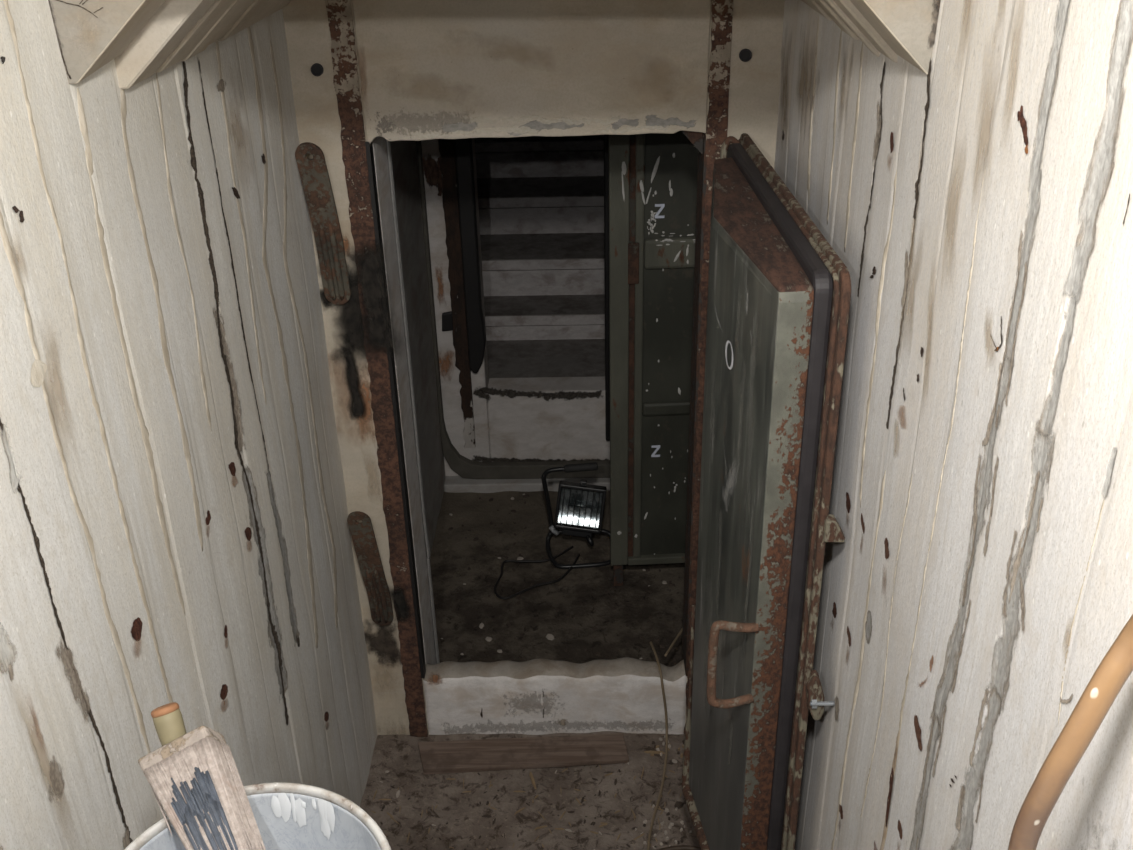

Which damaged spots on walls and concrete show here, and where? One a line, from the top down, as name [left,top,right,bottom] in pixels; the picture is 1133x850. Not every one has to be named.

crack [48,0,103,79]
peeling [403,115,696,138]
crack [886,58,931,429]
corrosion [357,381,372,432]
spalling [909,0,1133,850]
corrosion [846,492,865,548]
crack [0,419,133,849]